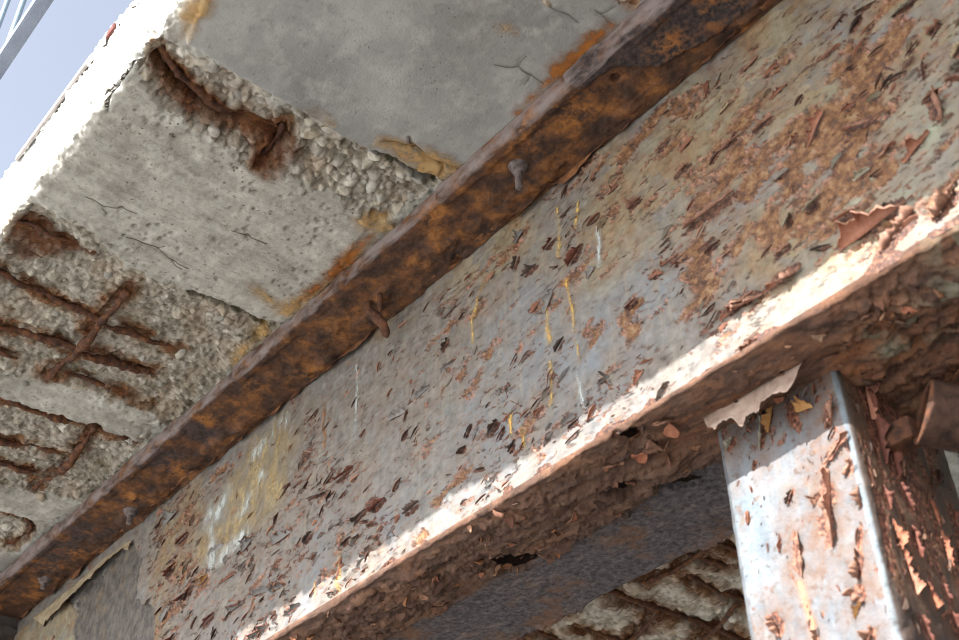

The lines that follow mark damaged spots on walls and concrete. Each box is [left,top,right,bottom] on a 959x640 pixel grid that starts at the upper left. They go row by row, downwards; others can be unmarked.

crack [541,0,633,23]
crack [496,57,544,85]
corrosion [152,40,297,180]
spalling [136,30,438,223]
crack [126,237,189,269]
corrosion [20,277,160,383]
spalling [0,199,285,503]
corrosion [0,414,122,491]
corrosion [603,419,681,472]
spalling [0,511,38,552]
peeling [351,545,373,571]
peeling [385,360,959,640]